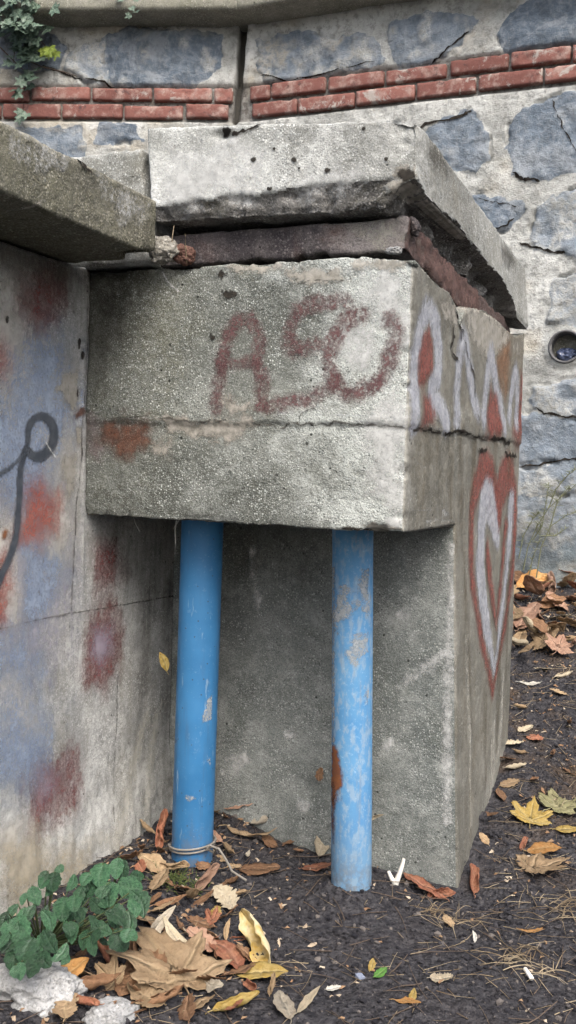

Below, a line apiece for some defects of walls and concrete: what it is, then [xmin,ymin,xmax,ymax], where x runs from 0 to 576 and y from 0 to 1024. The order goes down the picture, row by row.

crack [553,101,576,151]
leakage [162,136,262,219]
spalling [384,157,466,240]
spalling [441,300,524,358]
crack [117,415,226,423]
crack [256,310,576,467]
corrosion [331,745,342,835]